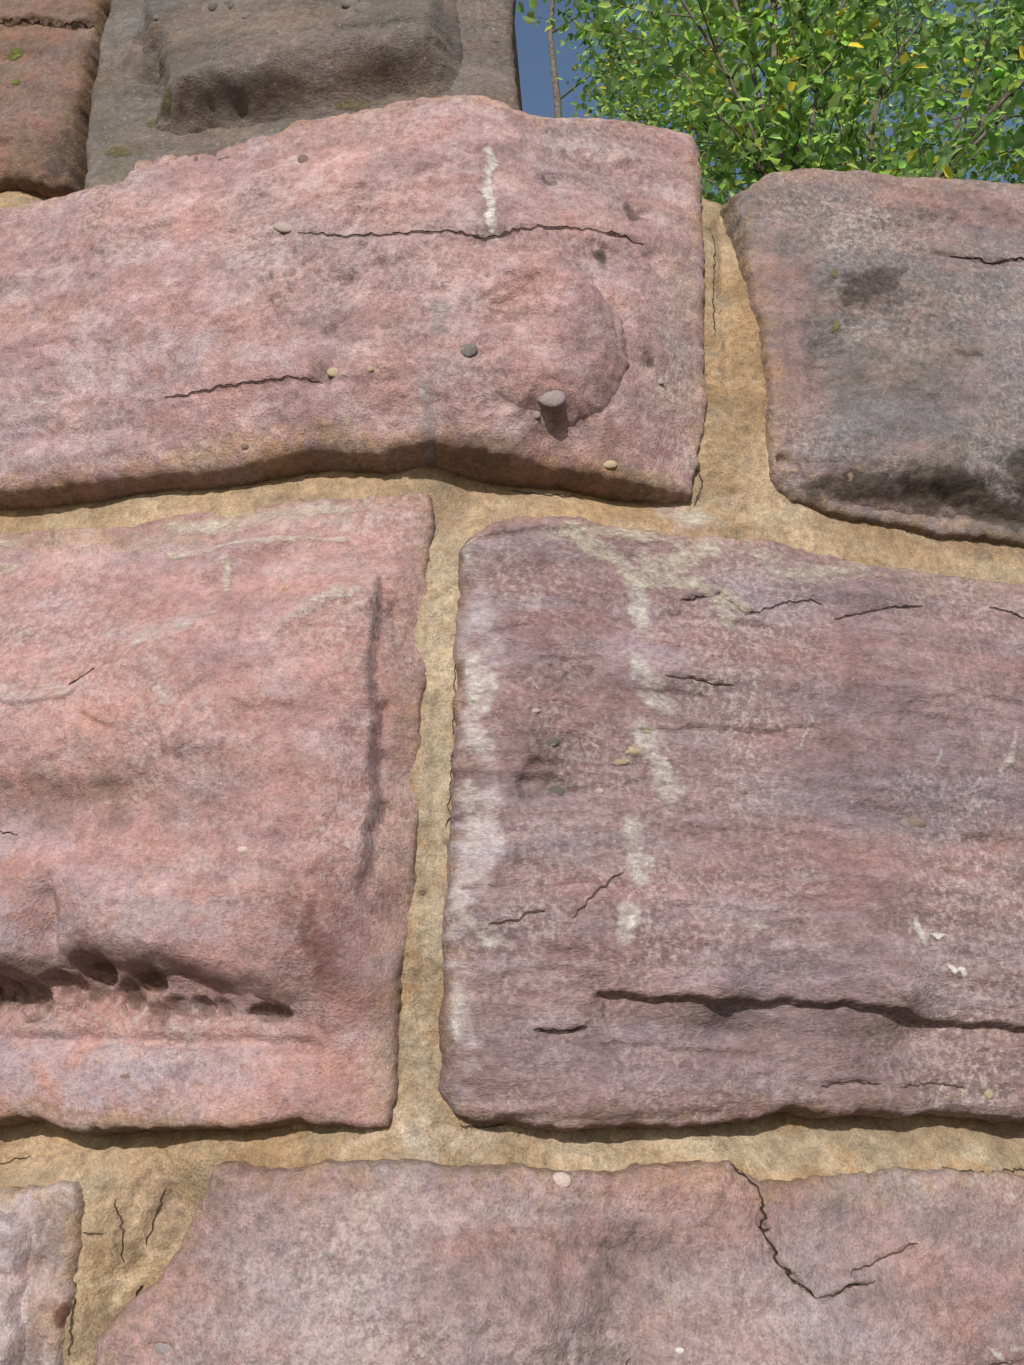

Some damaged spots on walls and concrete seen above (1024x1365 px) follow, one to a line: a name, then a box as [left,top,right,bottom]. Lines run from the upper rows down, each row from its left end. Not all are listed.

crack [731,1164,918,1298]